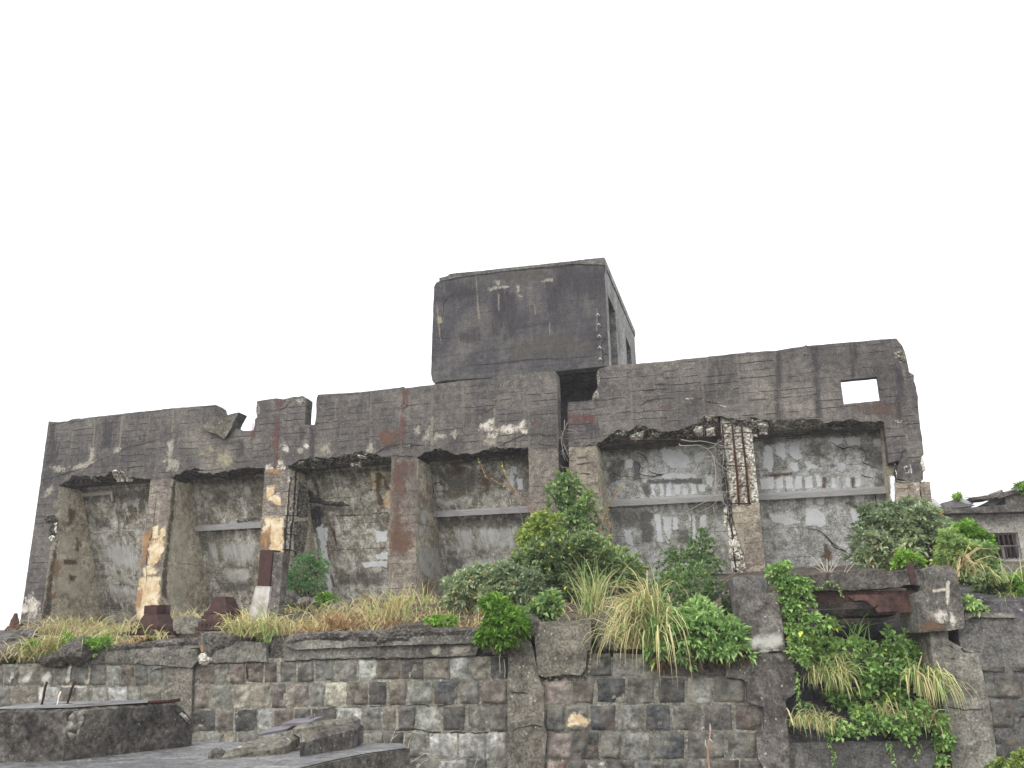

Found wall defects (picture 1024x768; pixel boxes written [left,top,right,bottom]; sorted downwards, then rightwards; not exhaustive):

peeling [826,421,882,453]
water stain [606,447,702,496]
spalling [628,398,865,573]
crack [830,442,912,504]
water stain [41,508,141,620]
peeling [136,481,191,620]
spalling [236,473,388,567]
peeling [621,529,643,565]
water stain [612,512,653,543]
crack [807,528,849,554]